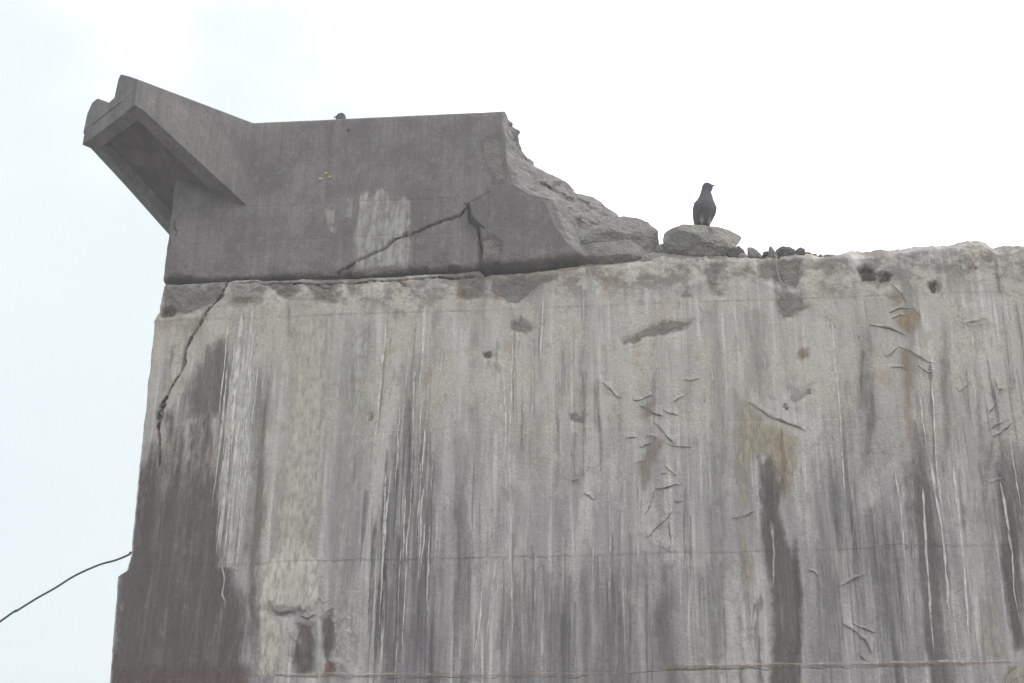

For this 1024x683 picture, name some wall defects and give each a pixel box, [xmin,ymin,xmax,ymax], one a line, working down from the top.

crack [292,208,483,287]
crack [156,284,227,453]
spalling [511,317,533,333]
spalling [623,321,692,344]
peeling [860,269,935,372]
water stain [111,310,451,683]
water stain [759,458,802,683]